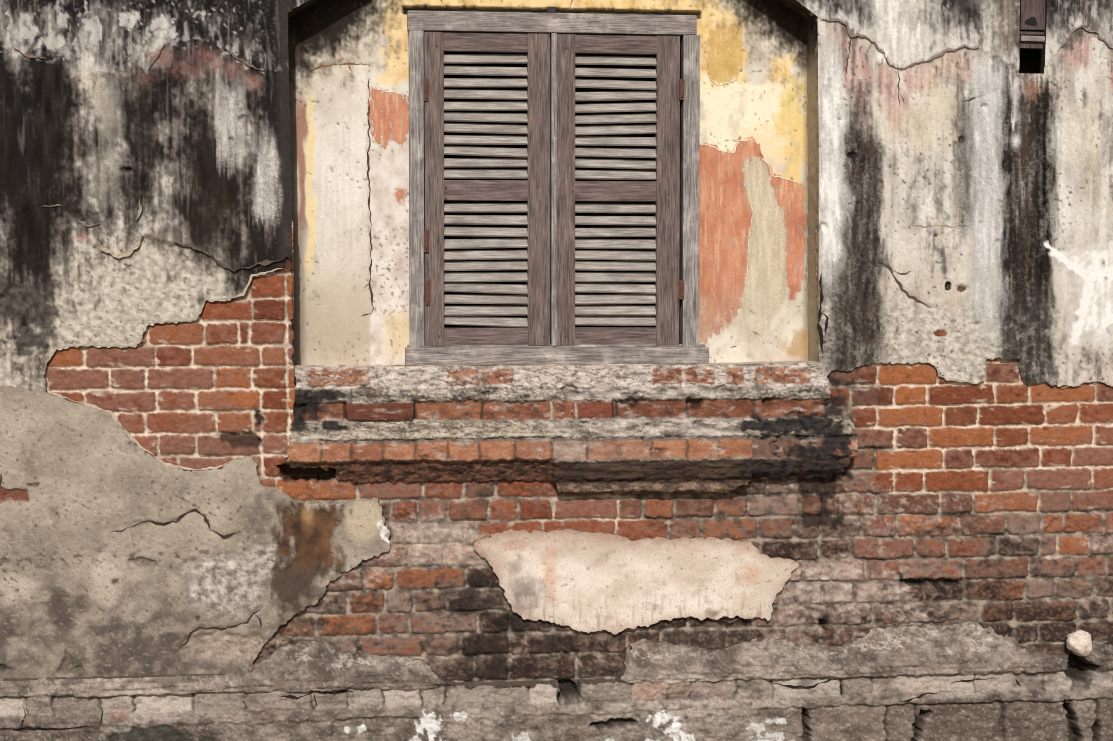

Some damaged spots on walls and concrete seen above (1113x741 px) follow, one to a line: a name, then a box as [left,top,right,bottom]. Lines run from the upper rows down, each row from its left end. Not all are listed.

leakage [119,11,178,39]
leakage [872,0,926,72]
leakage [0,0,102,263]
peeling [368,86,409,149]
leakage [253,137,281,222]
peeling [699,136,807,342]
leakage [739,0,884,528]
leakage [956,55,1058,384]
spalling [42,242,1113,686]
crack [112,508,241,539]
leakage [409,709,468,741]
leakage [645,710,695,741]